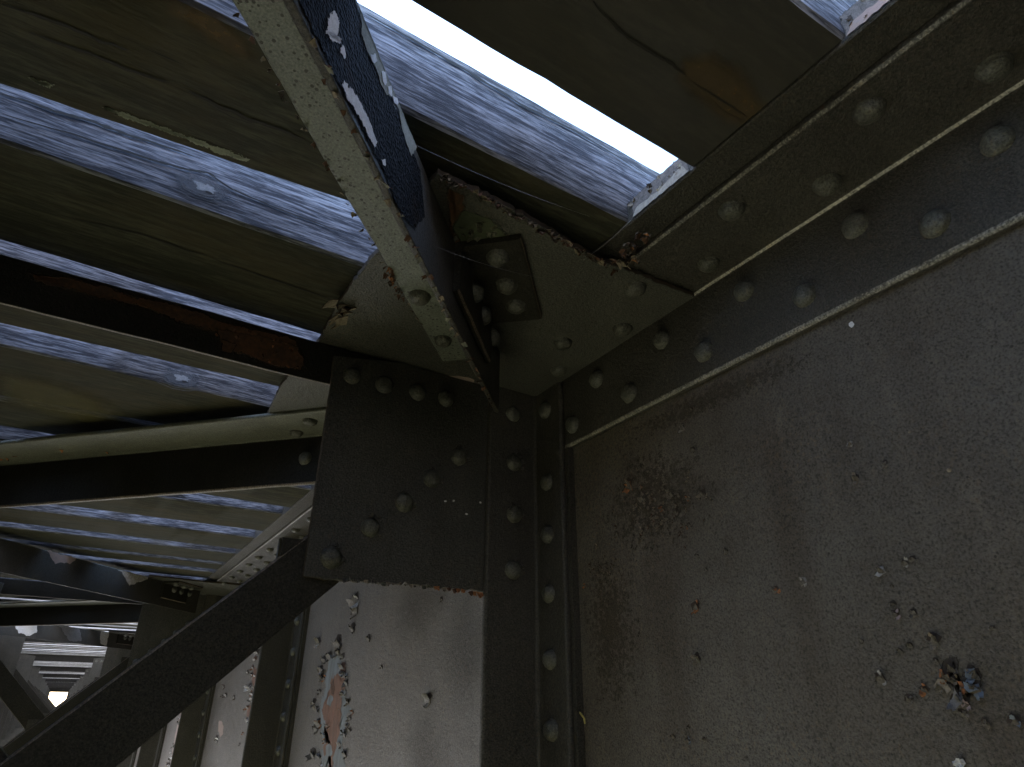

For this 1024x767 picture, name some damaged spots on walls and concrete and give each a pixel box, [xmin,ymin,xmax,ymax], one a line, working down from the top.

peeling [300,0,425,229]
corrosion [439,174,608,268]
corrosion [32,274,305,371]
peeling [305,591,359,767]
peeling [904,632,984,718]